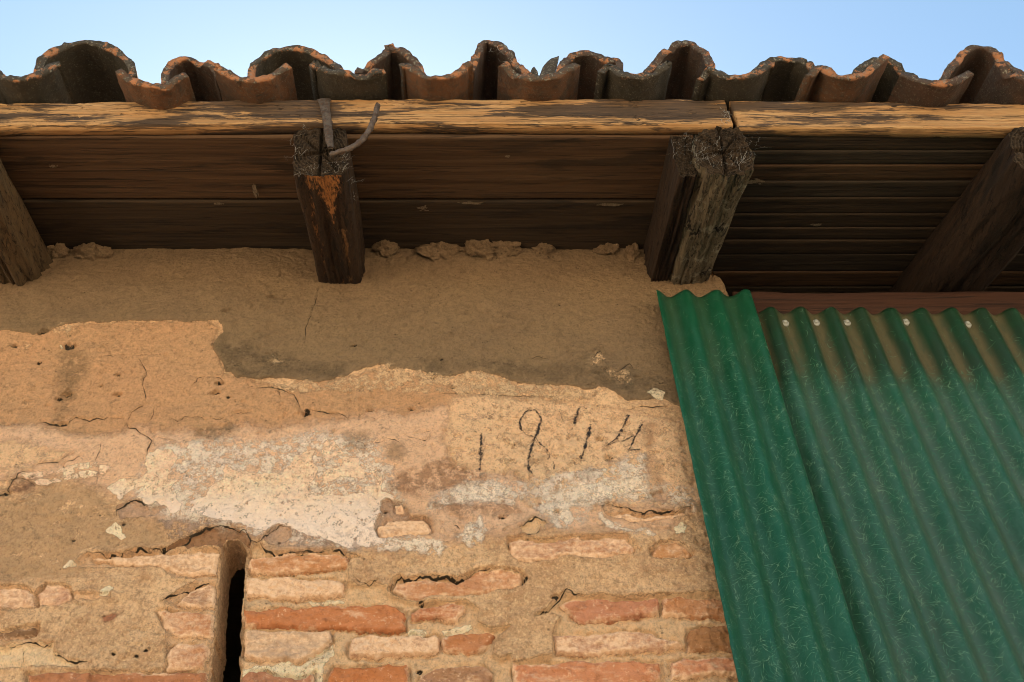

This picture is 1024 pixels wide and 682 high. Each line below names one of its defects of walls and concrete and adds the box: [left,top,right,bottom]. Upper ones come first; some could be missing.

crack [0,354,248,496]
crack [613,505,690,515]
crack [88,525,351,559]
flaking render [0,388,738,682]
crack [359,554,490,591]
crack [540,588,579,615]